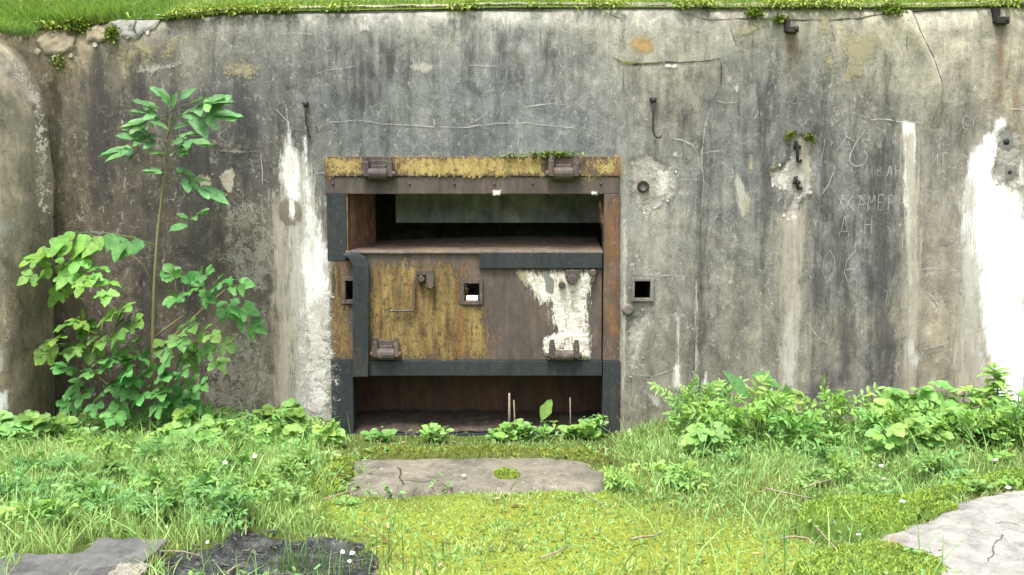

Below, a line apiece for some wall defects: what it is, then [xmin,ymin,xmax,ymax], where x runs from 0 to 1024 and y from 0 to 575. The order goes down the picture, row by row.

water stain [411,62,432,73]
peeling [324,155,363,178]
peeling [393,155,546,179]
spalling [579,151,678,219]
spalling [767,130,816,221]
crack [612,6,1020,408]
spalling [992,130,1022,190]
water stain [271,122,338,425]
water stain [837,260,853,378]
water stain [867,121,925,394]
water stain [951,118,1024,406]